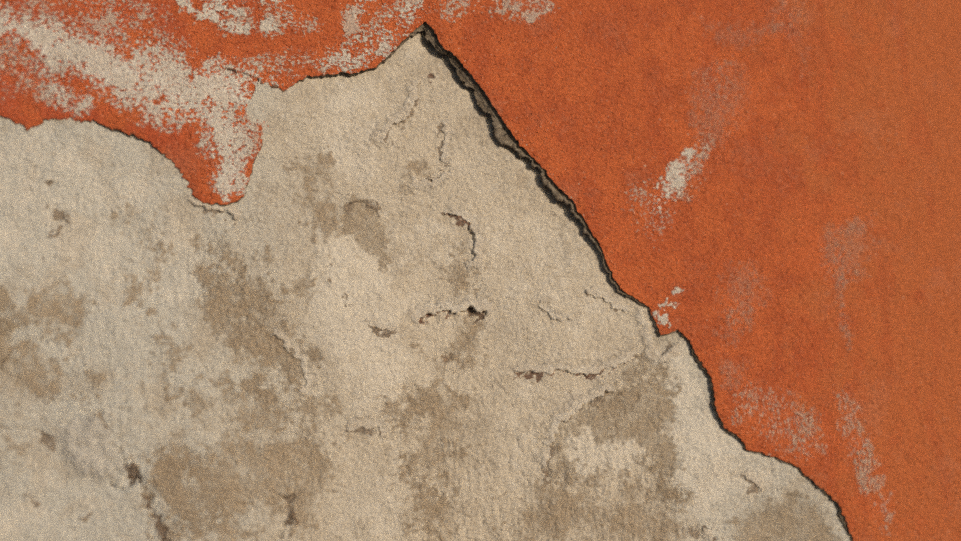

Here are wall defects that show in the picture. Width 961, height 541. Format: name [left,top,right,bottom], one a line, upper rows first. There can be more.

peeling [122,0,159,29]
peeling [153,11,191,49]
peeling [336,0,424,60]
peeling [253,54,296,75]
peeling [298,55,333,75]
peeling [323,48,373,73]
leakage [688,143,712,177]
leakage [290,146,343,242]
crack [35,428,55,452]
leakage [521,469,685,541]